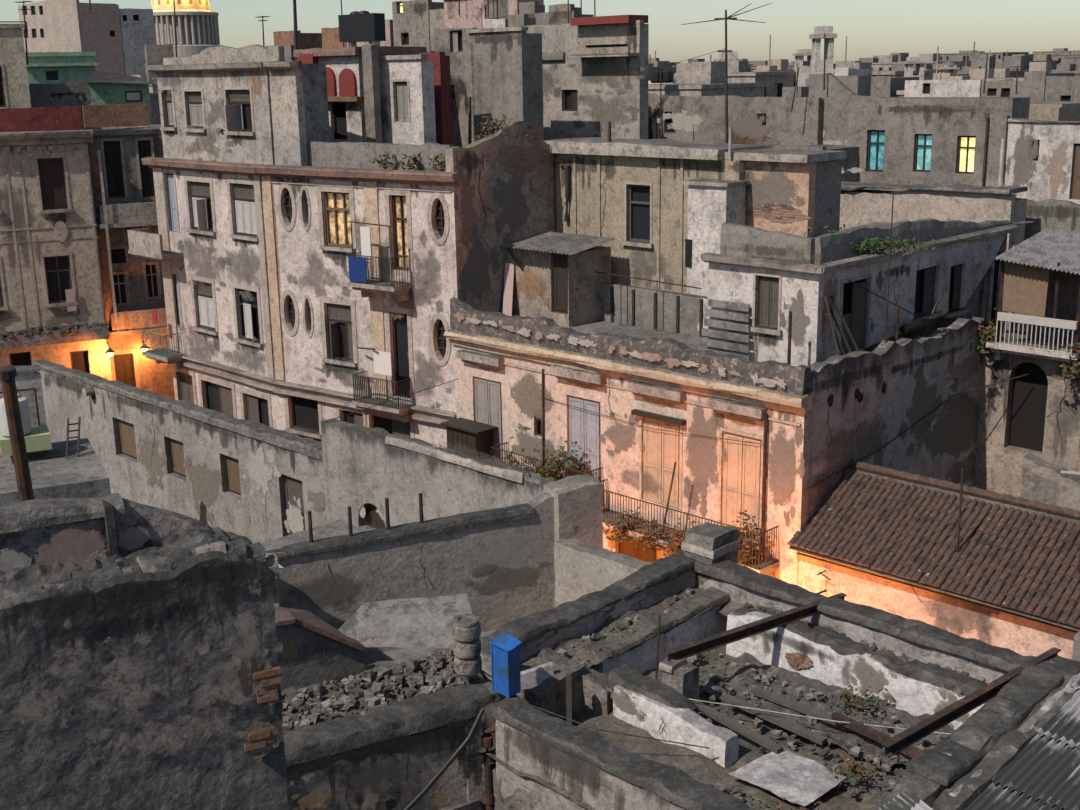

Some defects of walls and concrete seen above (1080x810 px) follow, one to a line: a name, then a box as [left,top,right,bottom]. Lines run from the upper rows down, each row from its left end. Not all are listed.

flaking render [744,162,811,224]
flaking render [391,232,443,319]
flaking render [454,145,596,347]
flaking render [780,290,811,347]
flaking render [608,345,786,389]
flaking render [183,455,222,524]
flaking render [598,411,644,457]
flaking render [683,397,727,518]
flaking render [760,410,805,527]
flaking render [0,526,227,592]
leakage [3,559,266,657]
flaking render [12,609,283,759]